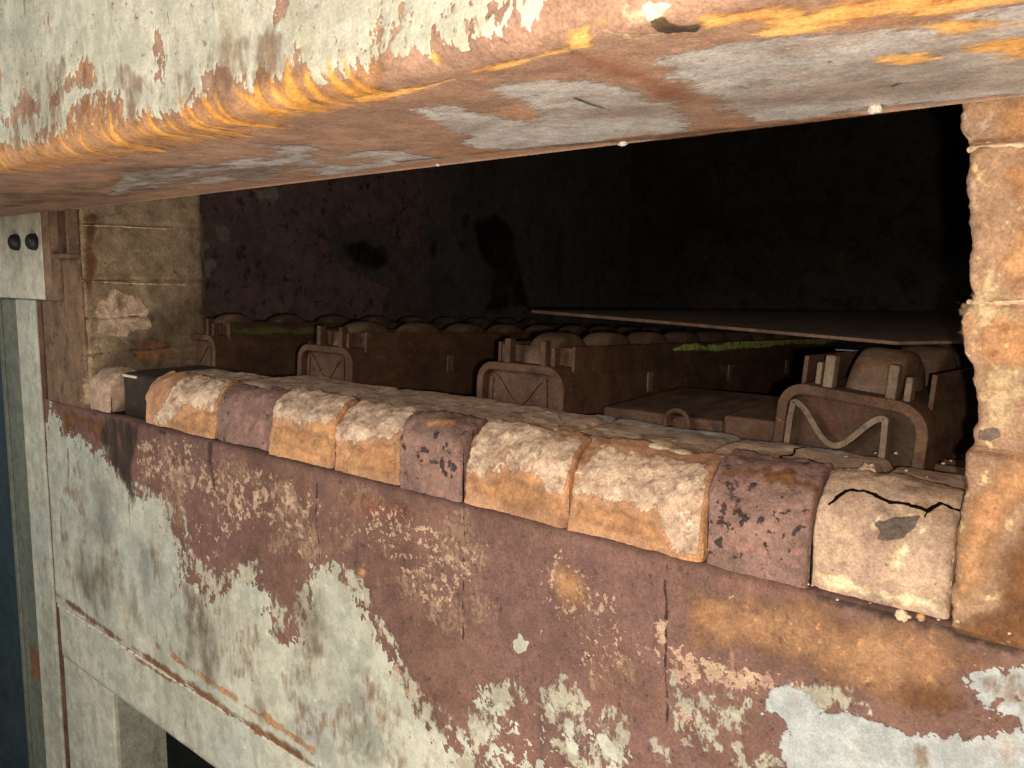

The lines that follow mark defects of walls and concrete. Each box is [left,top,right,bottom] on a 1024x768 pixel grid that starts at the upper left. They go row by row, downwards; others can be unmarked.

rust [0,34,451,174]
peeling [0,0,547,153]
rust [472,28,592,72]
peeling [409,5,1024,150]
rust [699,0,1024,60]
rust [876,53,941,65]
spalling [968,174,980,230]
crack [828,488,961,517]
peeling [46,400,1024,768]
rust [692,600,980,699]
rust [959,542,1024,650]
rust [138,643,314,765]